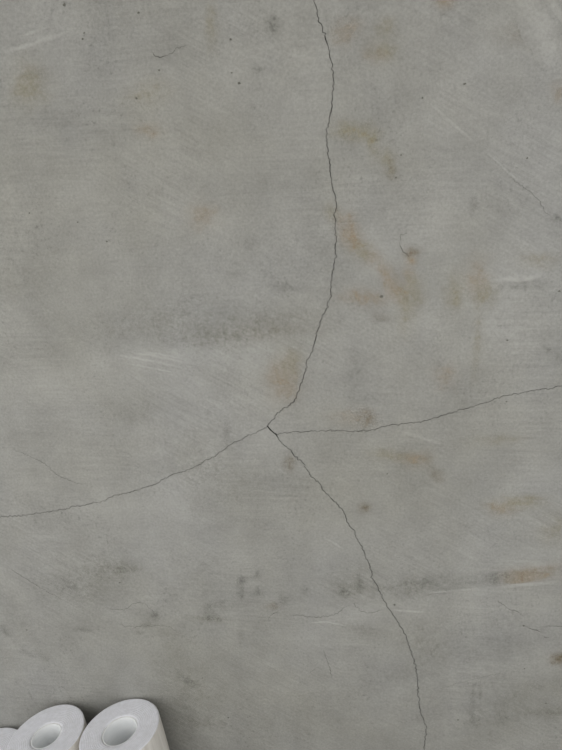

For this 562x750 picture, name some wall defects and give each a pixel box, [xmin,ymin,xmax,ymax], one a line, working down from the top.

crack [30,2,448,746]